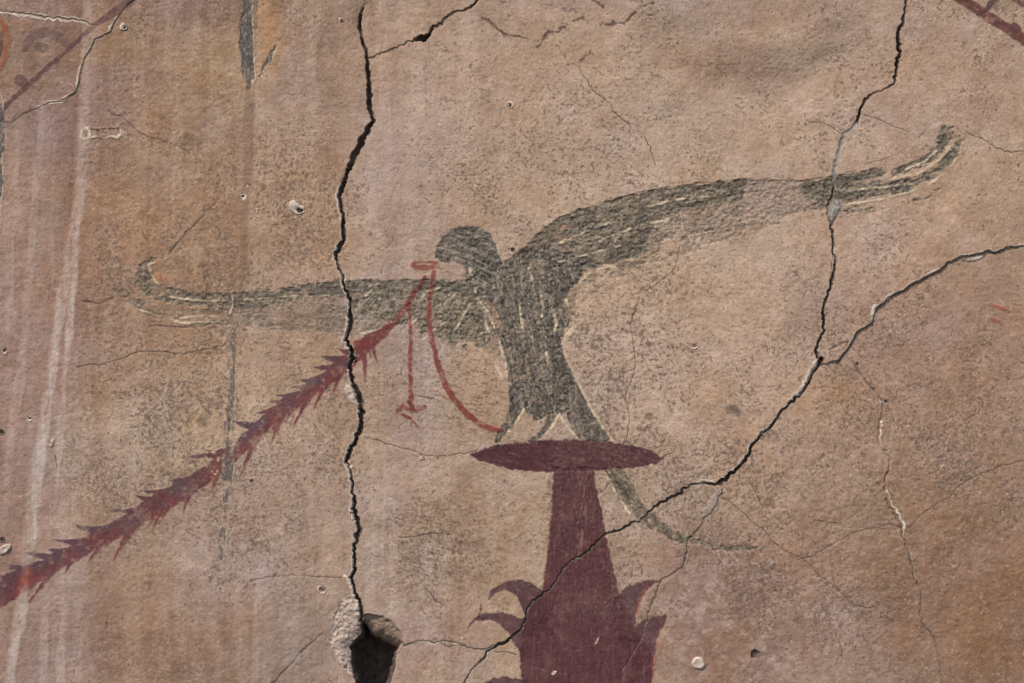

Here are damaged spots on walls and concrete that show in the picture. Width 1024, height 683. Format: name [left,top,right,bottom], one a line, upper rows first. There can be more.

crack [0,1,135,123]
hole [350,627,397,683]
crack [251,0,528,637]
crack [404,0,1024,683]